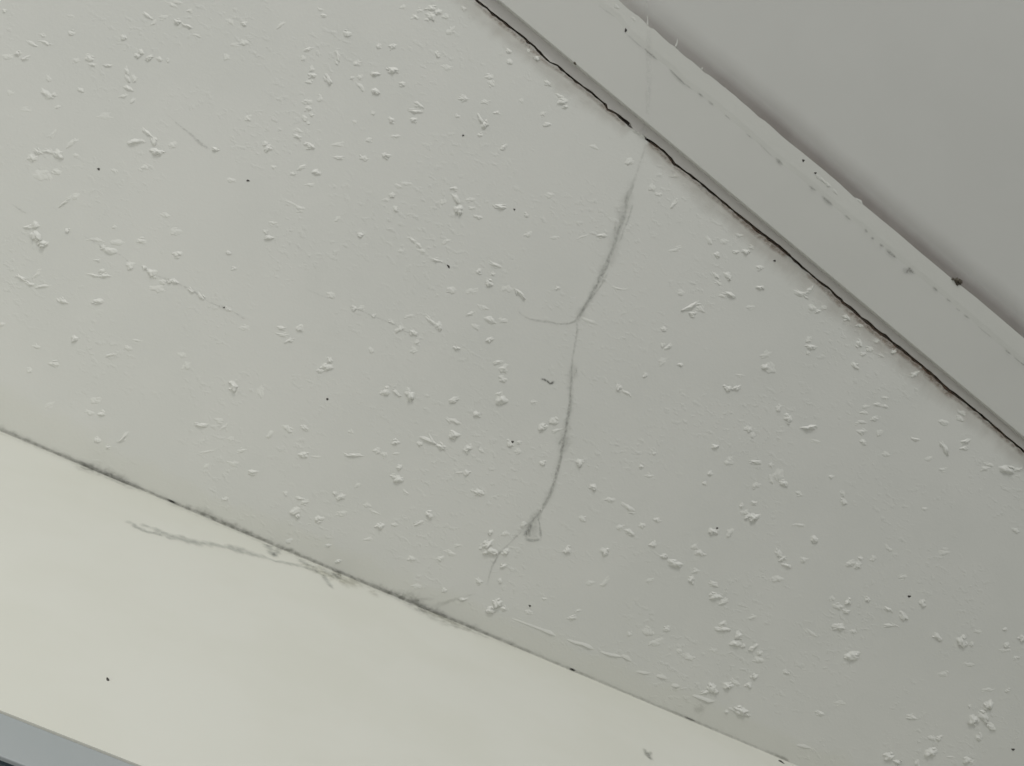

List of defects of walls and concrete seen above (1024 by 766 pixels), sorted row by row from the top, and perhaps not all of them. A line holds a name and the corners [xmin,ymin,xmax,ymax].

crack [475,0,1024,453]